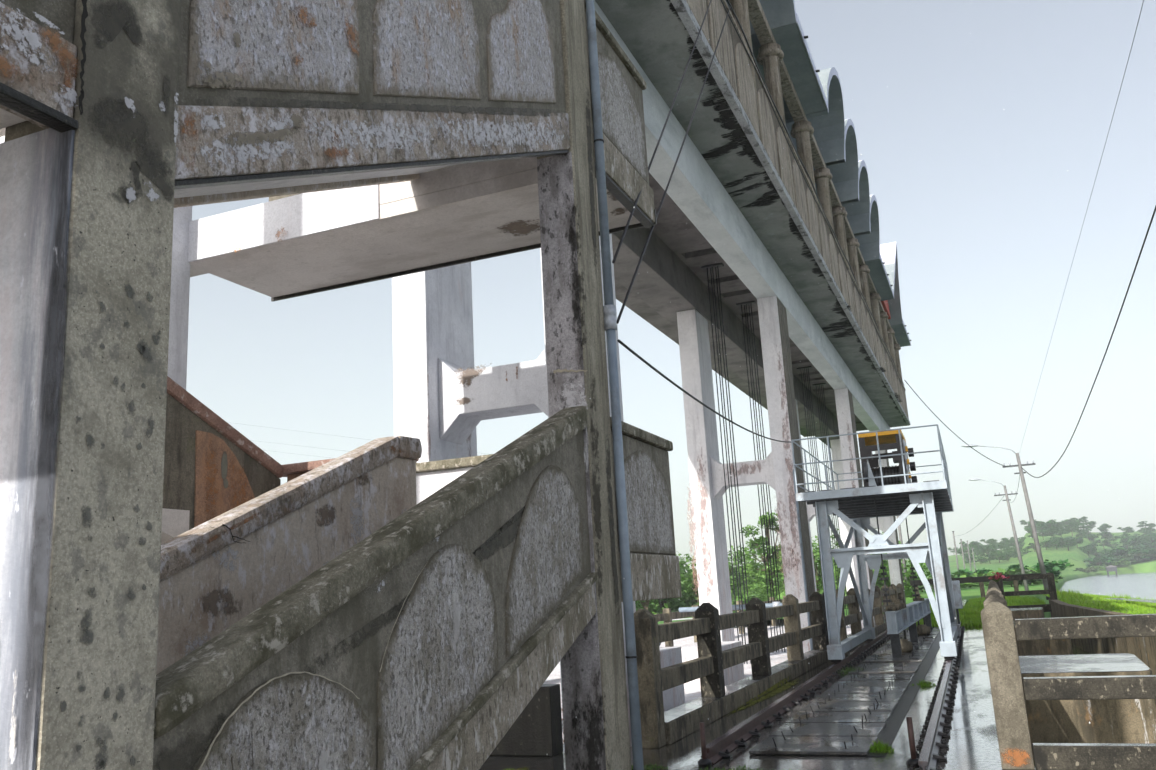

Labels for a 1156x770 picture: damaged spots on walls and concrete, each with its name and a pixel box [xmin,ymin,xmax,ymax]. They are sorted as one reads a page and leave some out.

water stain [92,0,142,49]
water stain [92,97,174,202]
water stain [159,77,179,142]
peeling [200,114,564,167]
water stain [567,94,627,356]
water stain [667,0,906,423]
rust [205,443,248,520]
water stain [557,378,619,613]
mould [571,695,610,770]
rust [1001,749,1029,767]